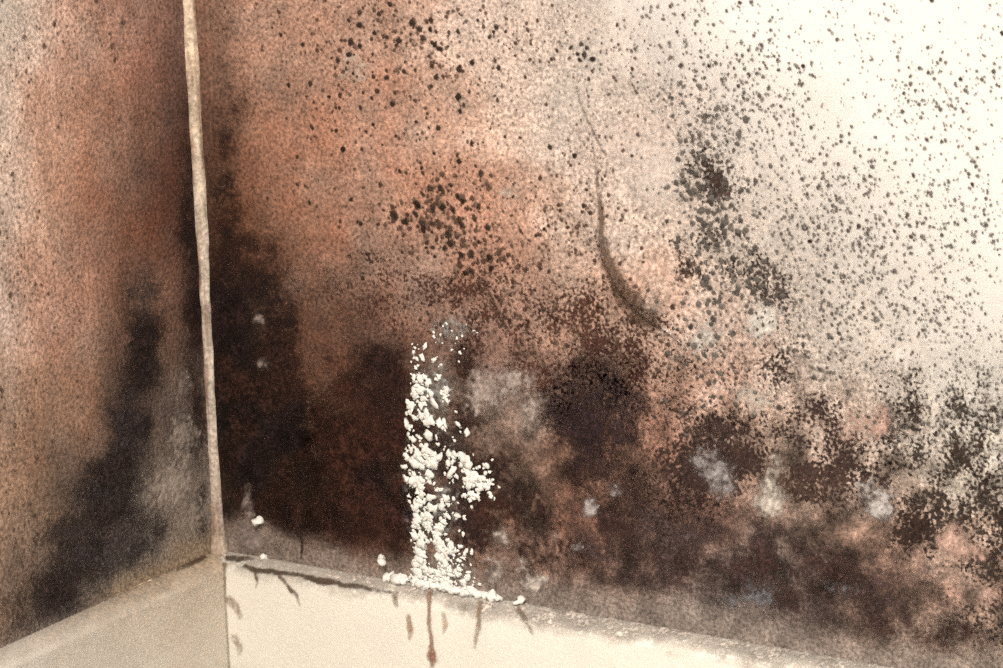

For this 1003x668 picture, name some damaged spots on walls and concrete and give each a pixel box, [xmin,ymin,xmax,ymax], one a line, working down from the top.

water stain [668,0,708,55]
water stain [755,28,780,81]
water stain [877,51,970,140]
water stain [954,56,1002,94]
water stain [898,155,1001,347]
crack [225,536,392,597]